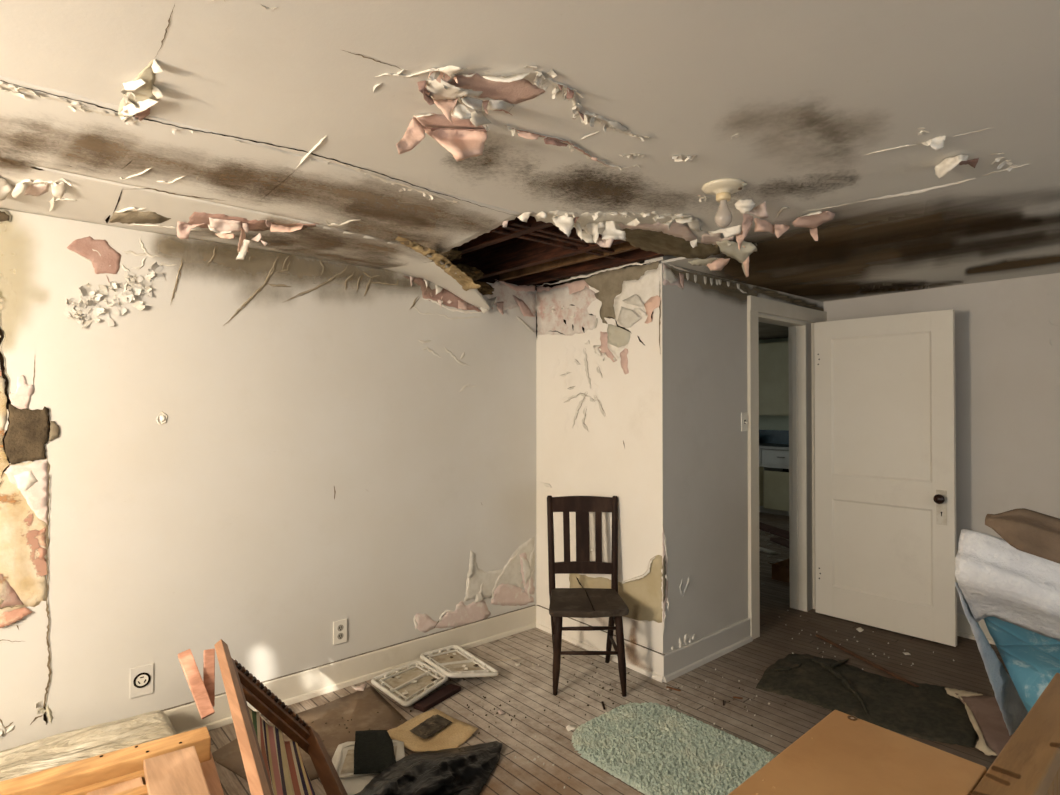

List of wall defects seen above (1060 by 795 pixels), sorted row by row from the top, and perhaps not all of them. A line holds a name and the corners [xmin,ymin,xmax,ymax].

damp [0,160,30,169]
peeling [105,191,361,260]
damp [19,134,498,286]
peeling [343,50,650,170]
damp [530,170,679,207]
peeling [395,127,1029,374]
damp [669,208,1060,311]
crack [0,310,35,484]
crack [551,342,608,435]
flaking render [0,365,60,628]
crack [0,474,53,739]
peeling [569,524,670,635]